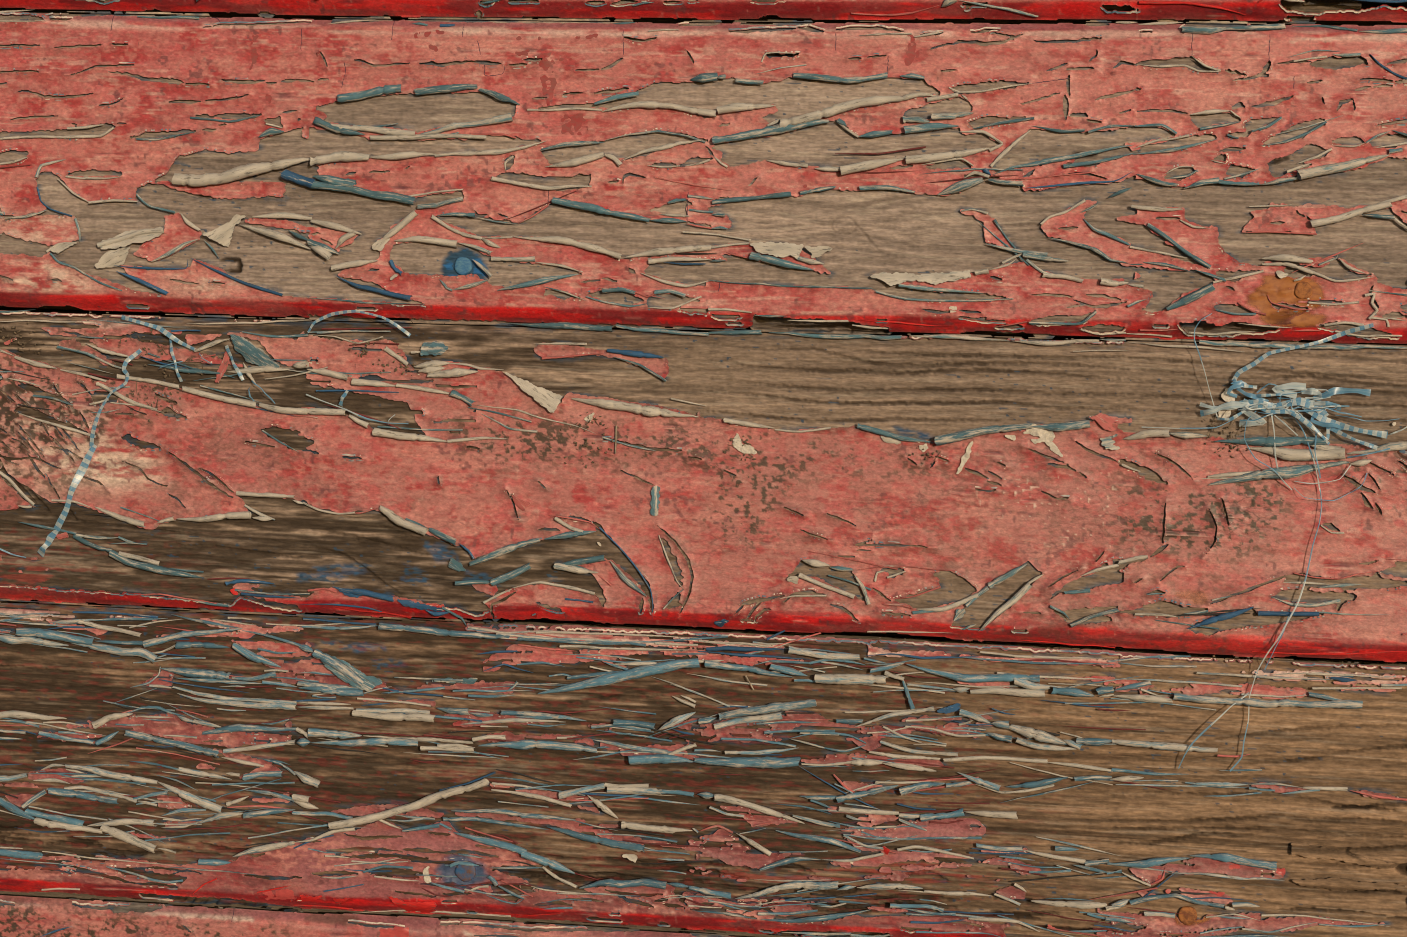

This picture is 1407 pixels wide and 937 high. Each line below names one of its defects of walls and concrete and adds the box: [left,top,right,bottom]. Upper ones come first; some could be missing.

peeling [0,0,111,22]
peeling [941,0,1038,17]
peeling [1102,0,1407,35]
peeling [414,30,444,52]
peeling [0,35,1407,485]
corrosion [1248,275,1325,327]
peeling [0,428,1407,937]